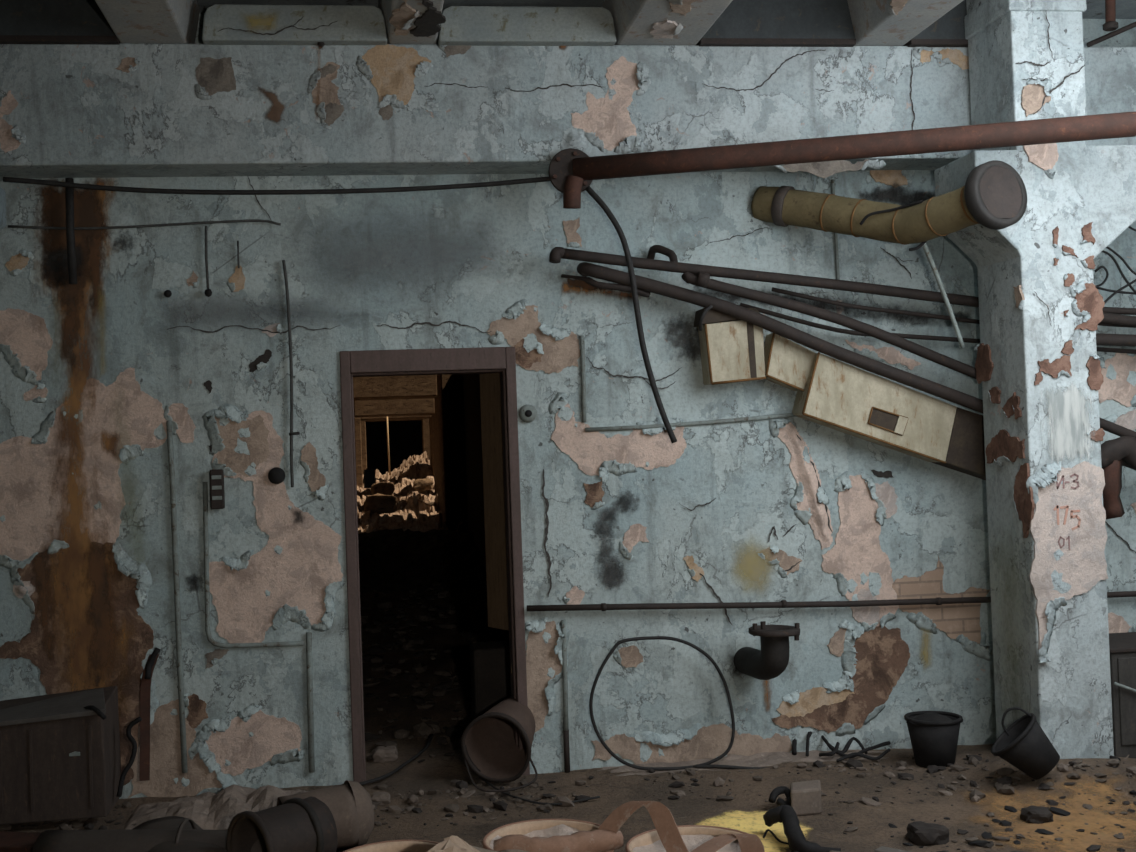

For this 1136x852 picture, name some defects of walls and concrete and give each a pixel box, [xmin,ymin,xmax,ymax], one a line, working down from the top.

spalling [307,62,344,126]
peeling [356,0,472,120]
crack [426,83,601,92]
peeling [571,56,651,154]
crack [702,50,825,91]
crack [908,49,916,157]
peeling [487,299,580,374]
rust [33,179,128,692]
peeling [0,308,346,798]
peeling [548,392,687,510]
spalling [591,418,993,764]
peeling [974,343,1108,663]